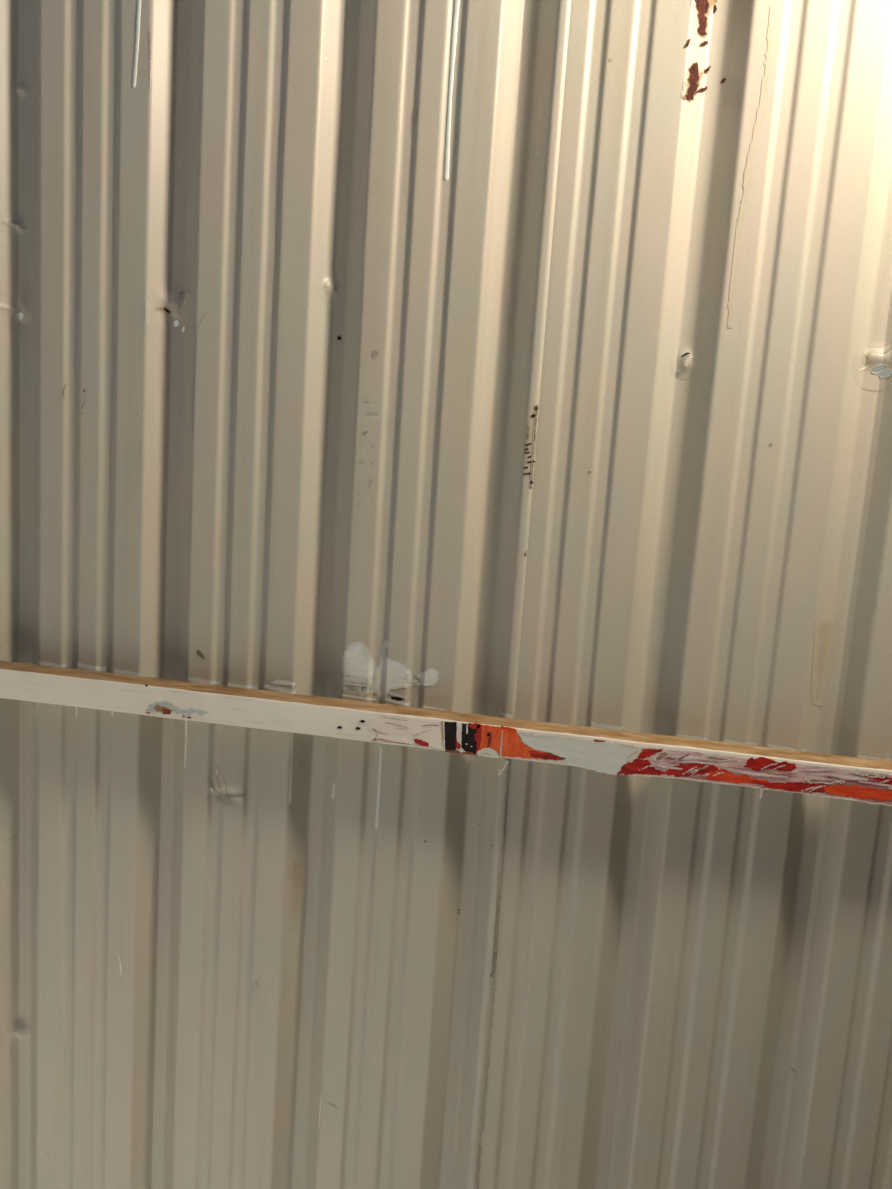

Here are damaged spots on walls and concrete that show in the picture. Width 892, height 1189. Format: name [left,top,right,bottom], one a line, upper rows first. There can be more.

rust [684,0,722,48]
rust [681,62,726,102]
rust [523,404,539,487]